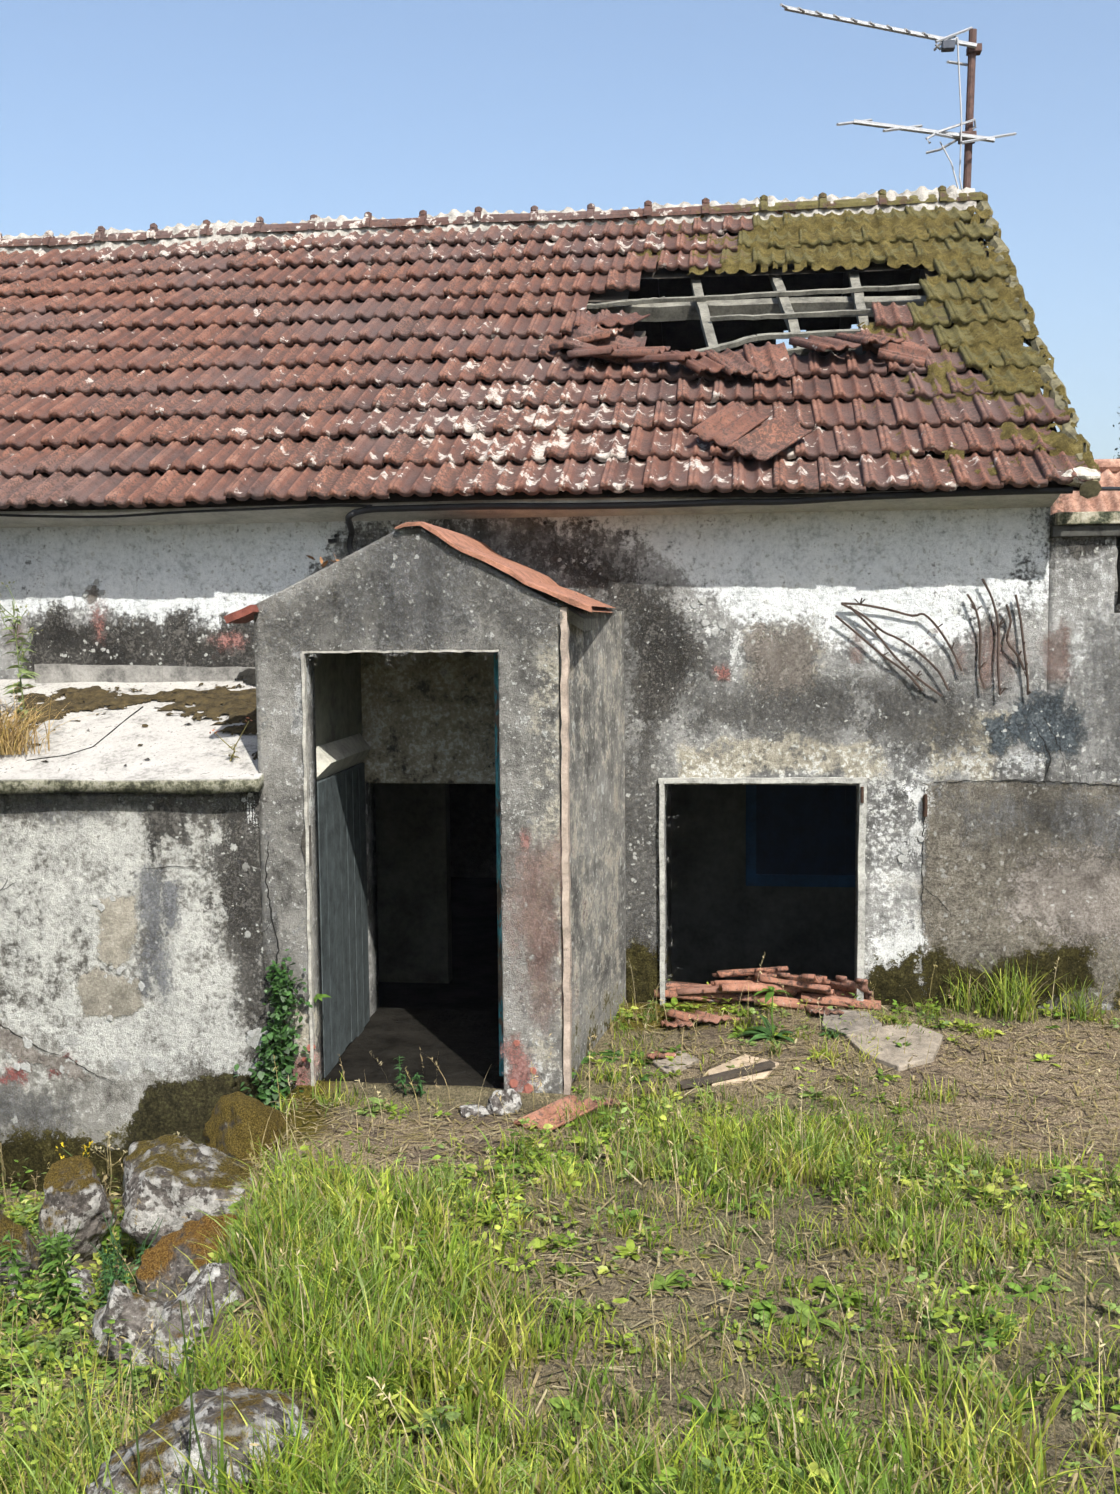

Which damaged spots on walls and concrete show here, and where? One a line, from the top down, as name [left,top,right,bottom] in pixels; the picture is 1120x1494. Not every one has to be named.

leakage [1028,496,1115,569]
leakage [12,521,1120,990]
crack [0,1024,118,1083]
leakage [0,783,284,1078]